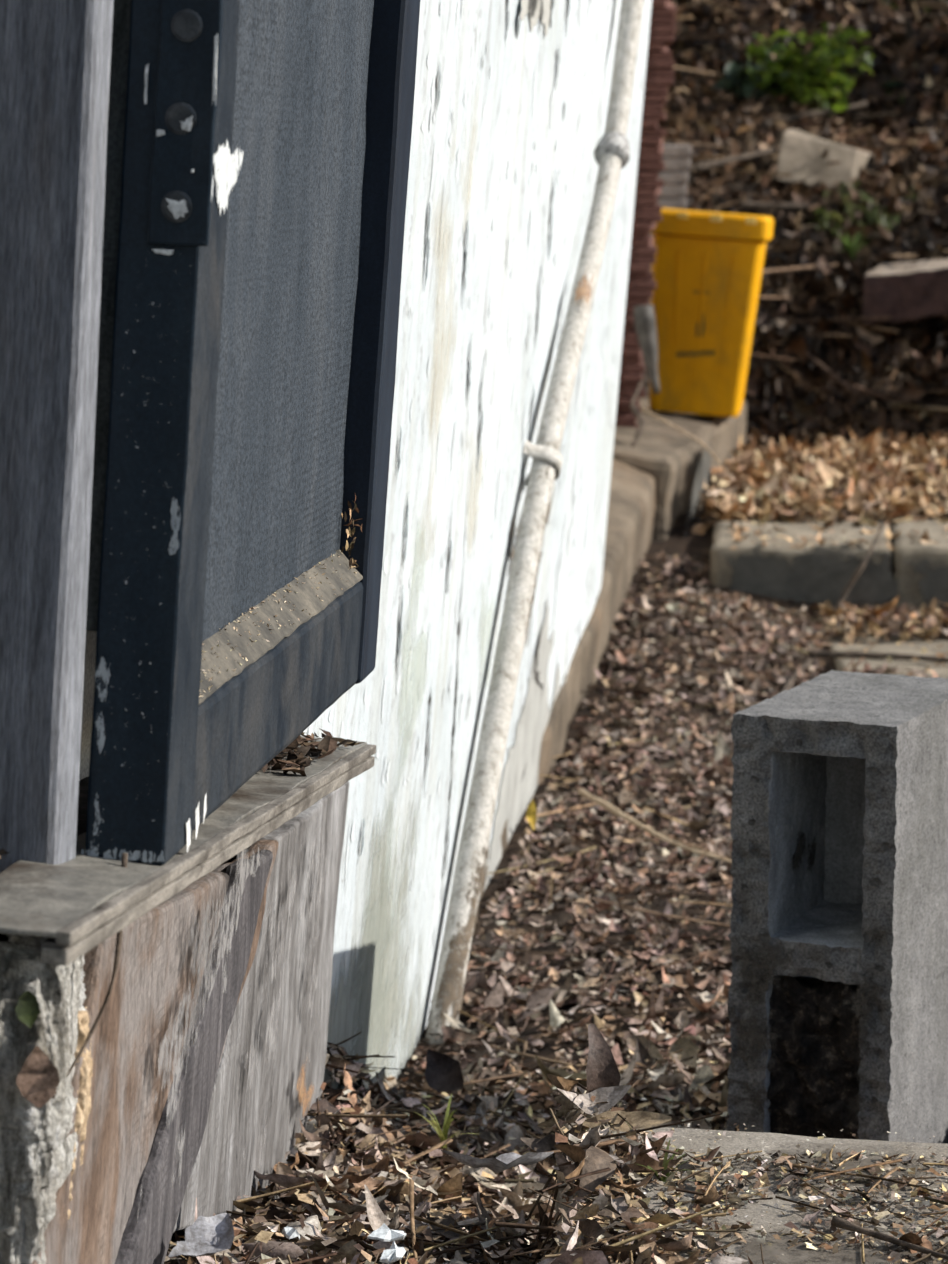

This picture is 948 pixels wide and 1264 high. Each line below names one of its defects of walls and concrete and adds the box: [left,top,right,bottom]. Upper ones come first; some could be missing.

peeling [506,0,616,51]